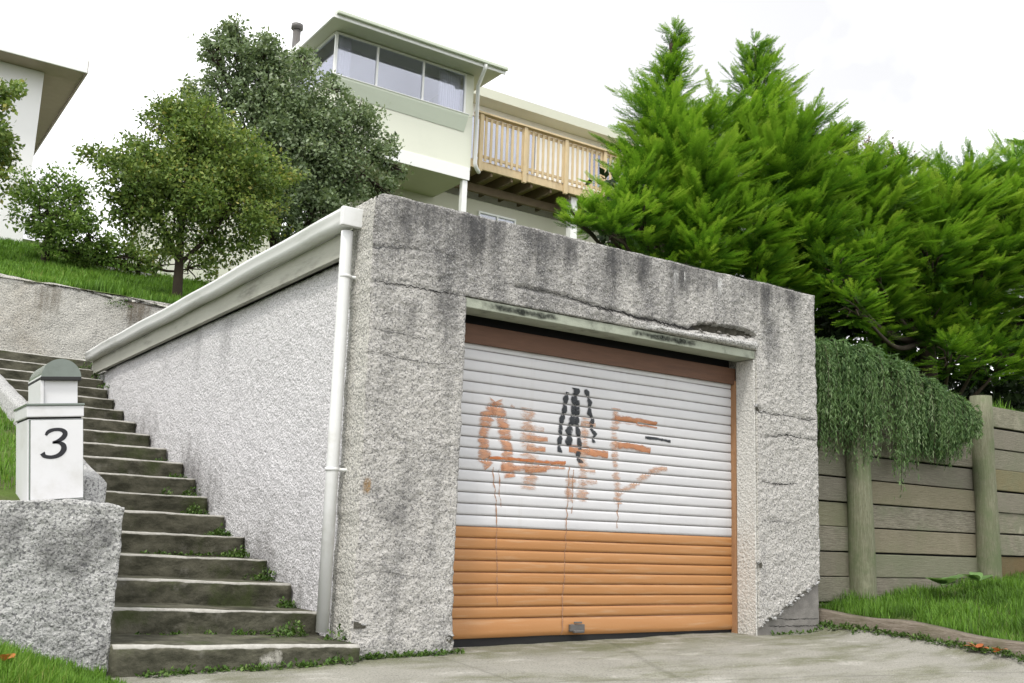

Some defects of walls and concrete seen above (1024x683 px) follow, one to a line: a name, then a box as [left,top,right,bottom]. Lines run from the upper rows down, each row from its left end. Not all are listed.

crack [375,280,470,297]
crack [499,283,695,330]
spalling [691,321,752,338]
crack [762,411,816,441]